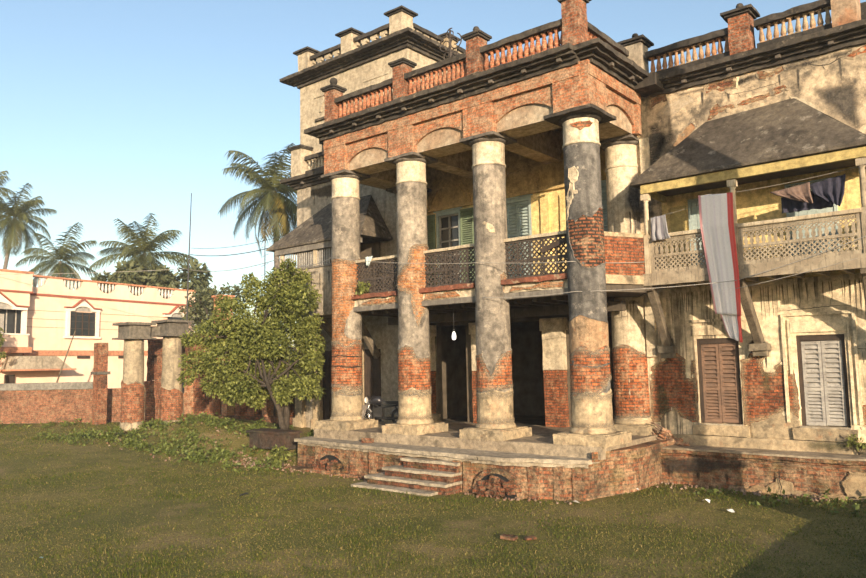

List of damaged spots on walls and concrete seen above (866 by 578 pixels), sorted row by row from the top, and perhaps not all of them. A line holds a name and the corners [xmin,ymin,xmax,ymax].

flaking render [570,120,593,130]
leakage [650,88,706,166]
leakage [738,75,757,86]
leakage [778,50,857,126]
flaking render [566,166,606,271]
flaking render [331,242,462,421]
leakage [748,279,866,317]
flaking render [120,379,145,424]
flaking render [472,348,515,424]
flaking render [543,311,700,429]
flaking render [740,353,802,426]